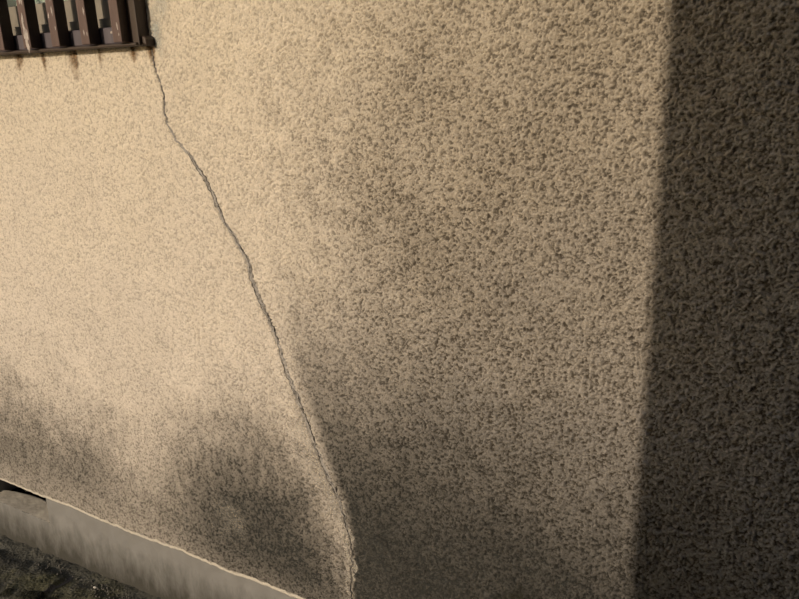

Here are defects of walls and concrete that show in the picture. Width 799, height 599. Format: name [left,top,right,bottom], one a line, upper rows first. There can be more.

crack [150,46,354,599]